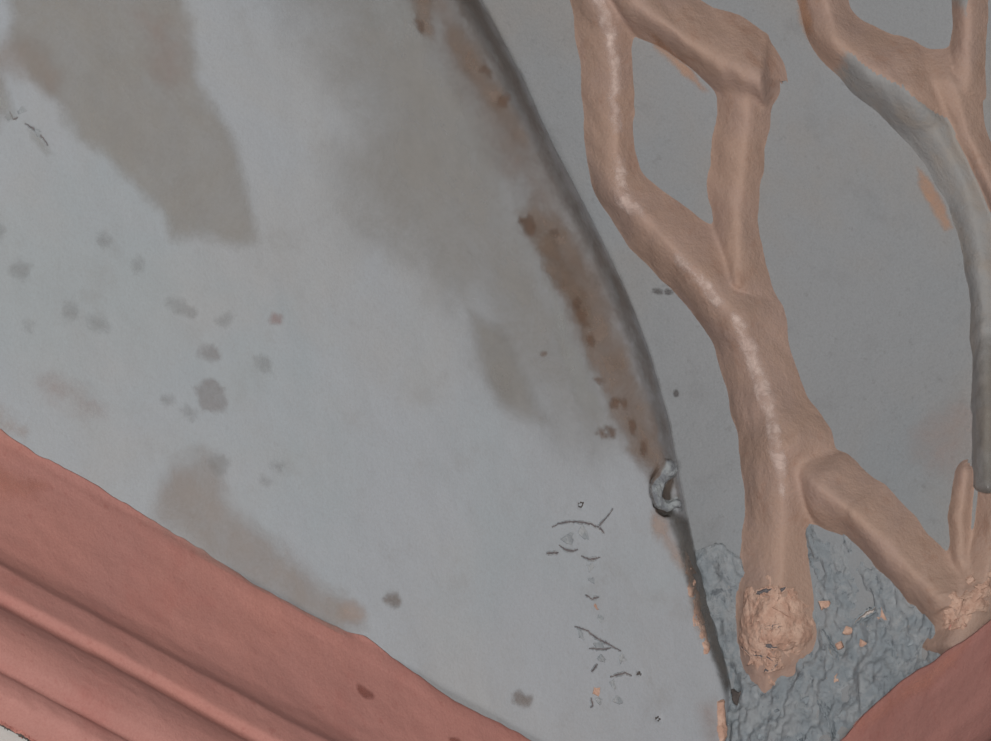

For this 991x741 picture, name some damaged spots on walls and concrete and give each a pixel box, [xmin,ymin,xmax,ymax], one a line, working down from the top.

crack [546,508,613,572]
peeling [679,524,991,741]